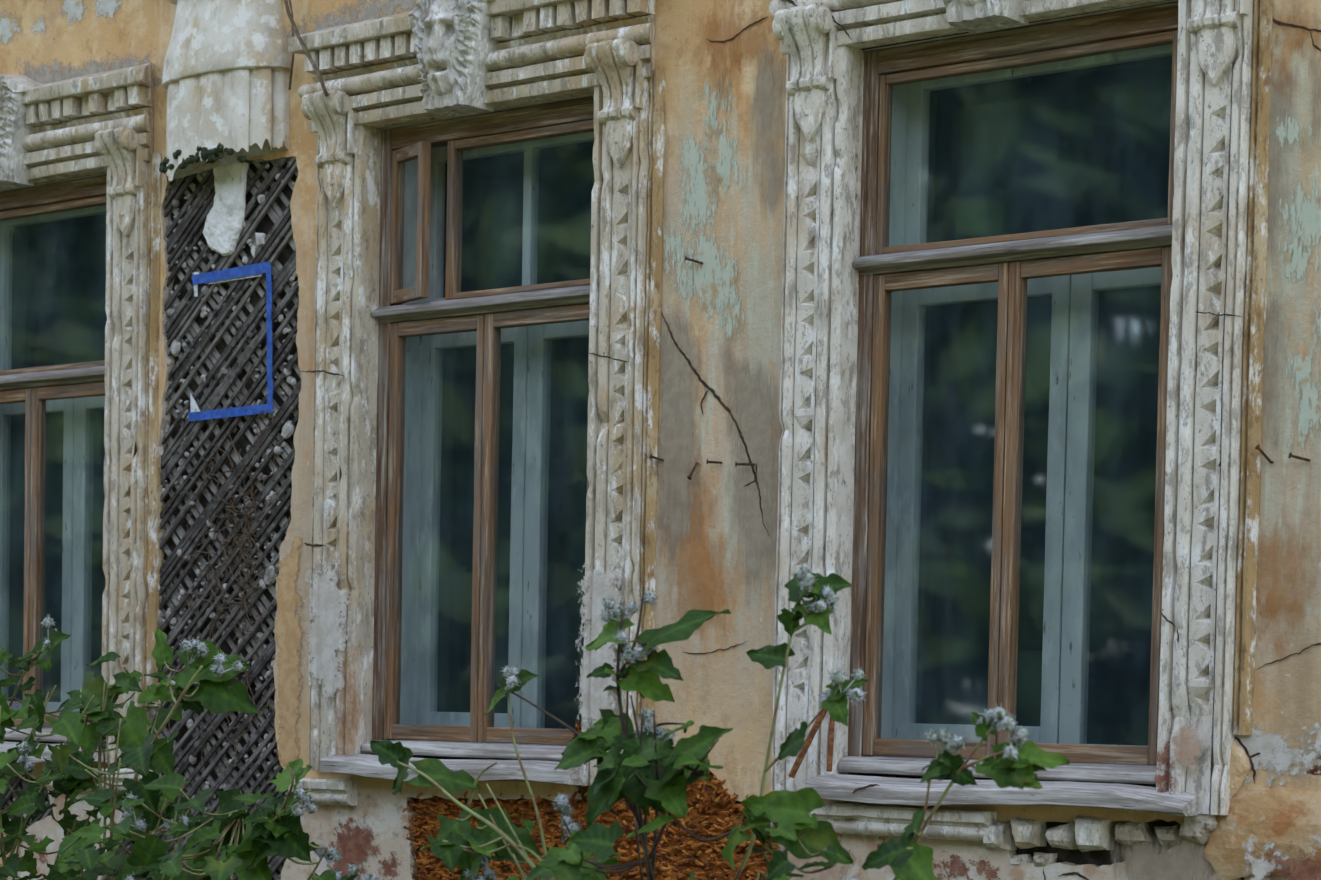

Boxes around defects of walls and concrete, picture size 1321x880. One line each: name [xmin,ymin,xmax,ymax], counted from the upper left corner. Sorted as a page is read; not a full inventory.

peeling [0,10,46,44]
peeling [59,0,123,27]
crack [1272,17,1321,51]
peeling [1271,95,1317,152]
peeling [662,75,752,347]
peeling [1278,179,1321,449]
crack [661,311,770,536]
flaking render [106,156,351,880]
crack [1256,643,1321,670]
peeling [1223,721,1321,798]